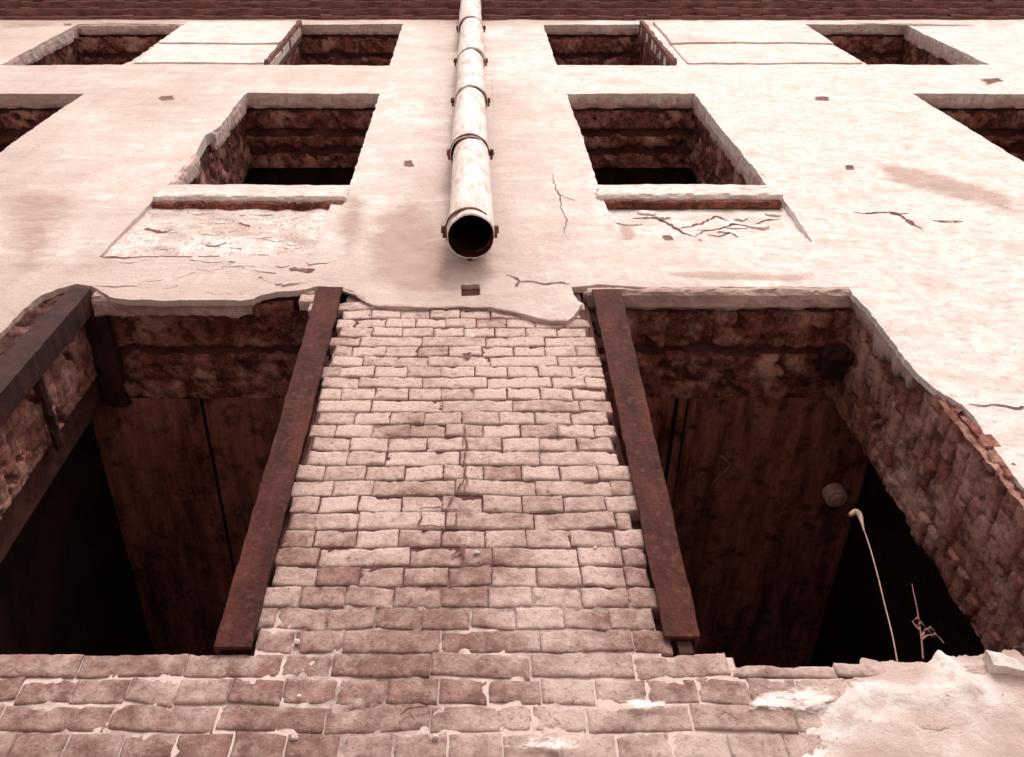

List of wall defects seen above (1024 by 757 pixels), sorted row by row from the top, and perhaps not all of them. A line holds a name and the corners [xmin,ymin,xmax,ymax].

peeling [193,211,229,236]
crack [552,173,575,231]
crack [617,210,781,241]
crack [852,211,962,229]
peeling [92,233,340,318]
crack [508,275,568,287]
spalling [253,289,673,658]
spalling [833,302,1024,656]